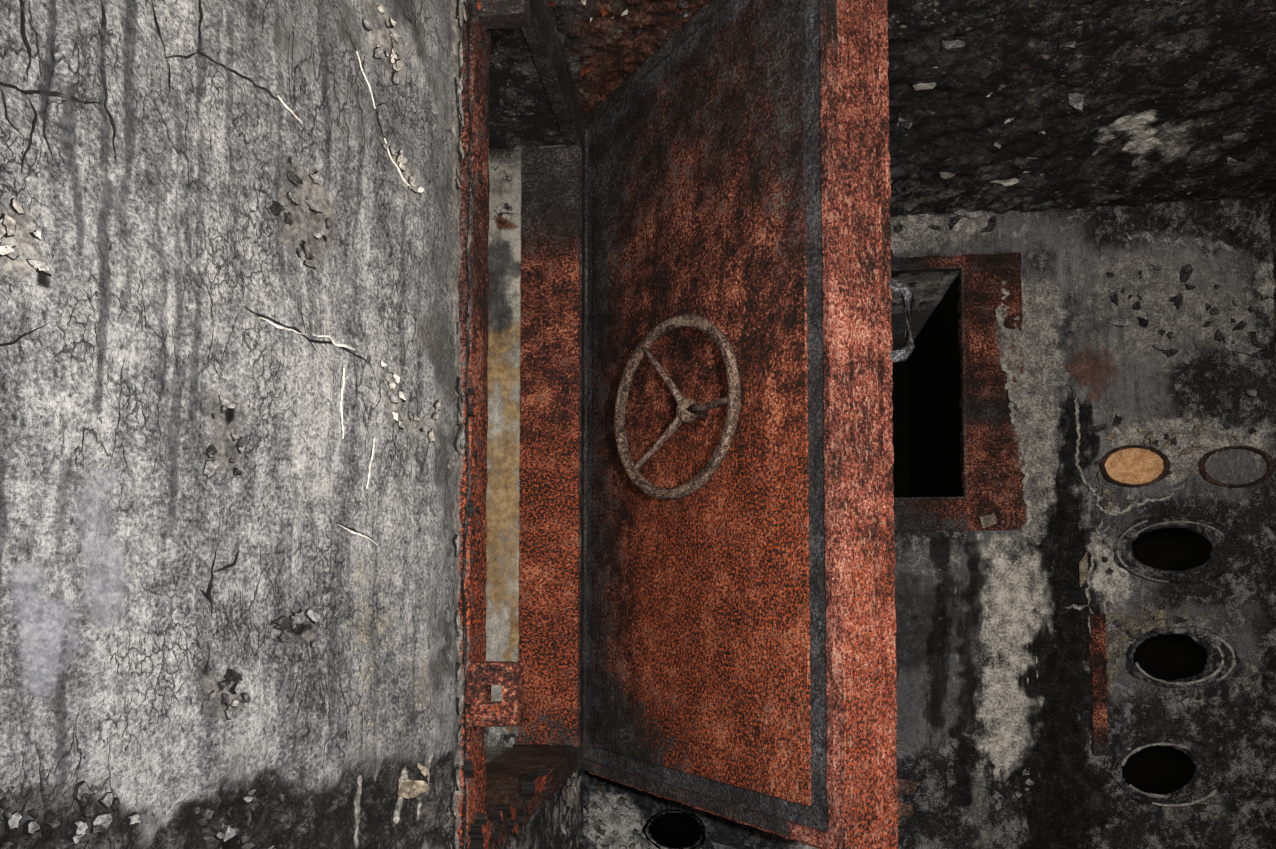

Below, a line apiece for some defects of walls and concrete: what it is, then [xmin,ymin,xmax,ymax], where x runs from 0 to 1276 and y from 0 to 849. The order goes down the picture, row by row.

crack [0,0,116,173]
crack [152,0,304,124]
corrosion [571,0,711,111]
leakage [486,237,521,661]
leakage [1088,536,1130,608]
peeling [208,668,251,720]
peeling [0,780,140,849]
peeling [193,788,291,849]
leakage [354,776,362,847]
leakage [393,755,433,824]
corrosion [466,760,474,778]
corrosion [467,772,553,849]